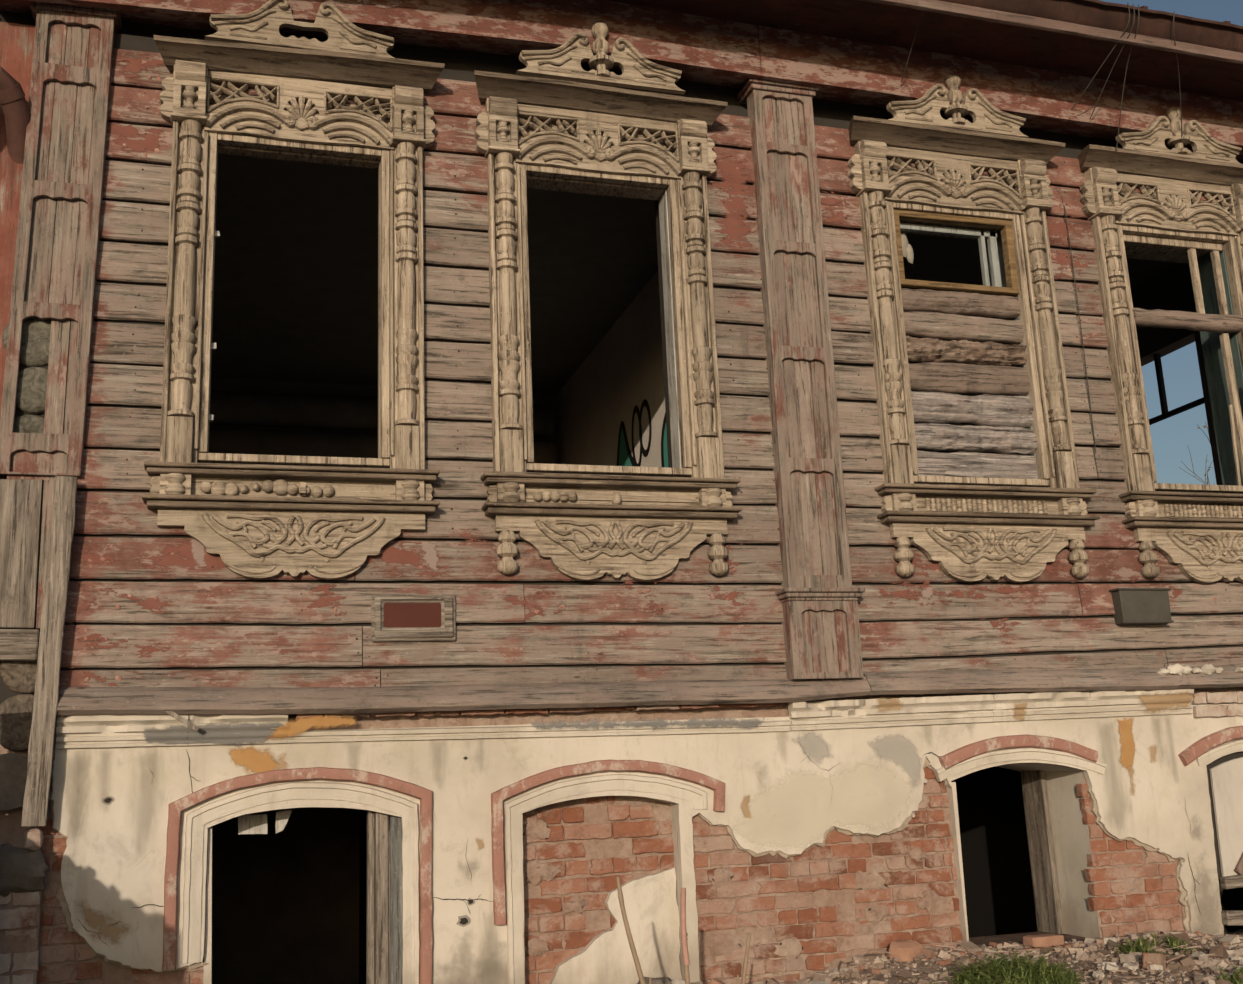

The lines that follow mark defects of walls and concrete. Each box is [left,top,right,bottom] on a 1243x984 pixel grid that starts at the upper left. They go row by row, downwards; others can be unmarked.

peeling [107,115,167,164]
peeling [709,148,759,250]
peeling [66,544,175,687]
peeling [142,539,227,580]
peeling [305,540,450,621]
peeling [701,543,751,619]
peeling [879,551,1031,644]
spalling [1191,691,1243,718]
spalling [36,819,72,880]
spalling [692,733,963,984]
spalling [1076,784,1189,937]
spalling [38,894,114,984]